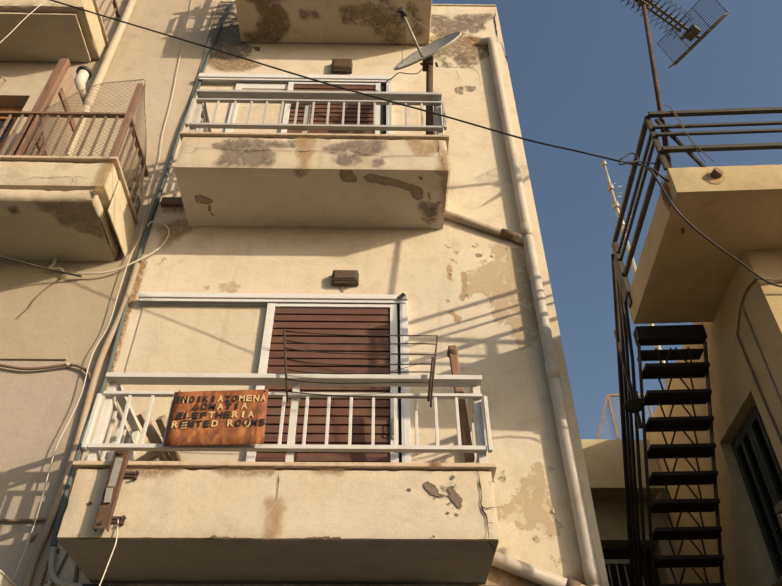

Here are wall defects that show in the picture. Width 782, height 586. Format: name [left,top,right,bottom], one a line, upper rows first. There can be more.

leakage [208,0,290,71]
leakage [340,0,492,68]
leakage [213,137,295,166]
leakage [325,139,385,166]
flaking render [339,170,440,222]
flaking render [445,243,540,349]
flaking render [423,474,463,516]
crack [476,468,496,552]
flaking render [497,461,563,543]